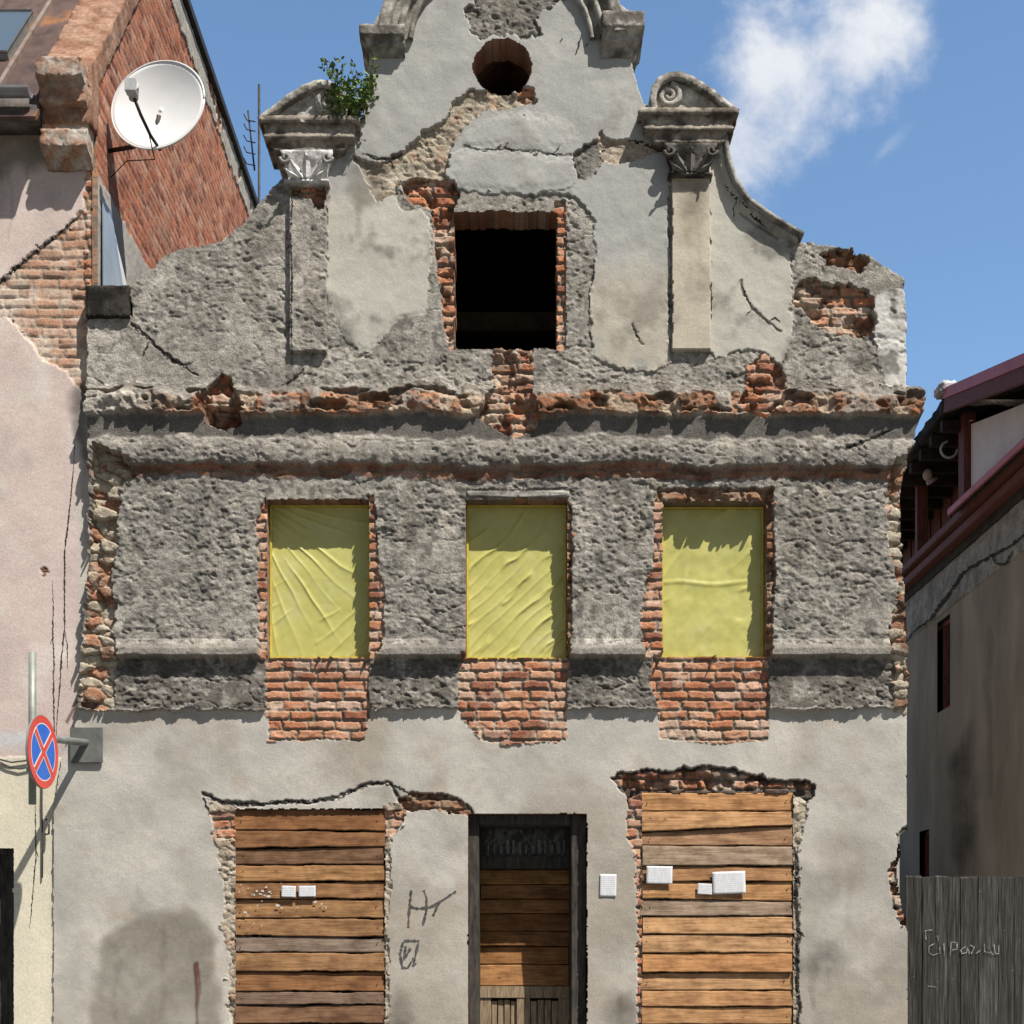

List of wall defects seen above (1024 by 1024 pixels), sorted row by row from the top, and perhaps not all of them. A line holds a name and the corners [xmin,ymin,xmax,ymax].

peeling [0,171,92,392]
crack [132,325,194,374]
spalling [354,87,538,351]
crack [740,282,780,328]
spalling [793,250,879,339]
crack [50,440,75,736]
spalling [255,496,386,743]
spalling [458,504,576,747]
spalling [640,487,778,745]
crack [905,534,1024,642]
spalling [382,792,474,1024]
spalling [611,765,816,1024]